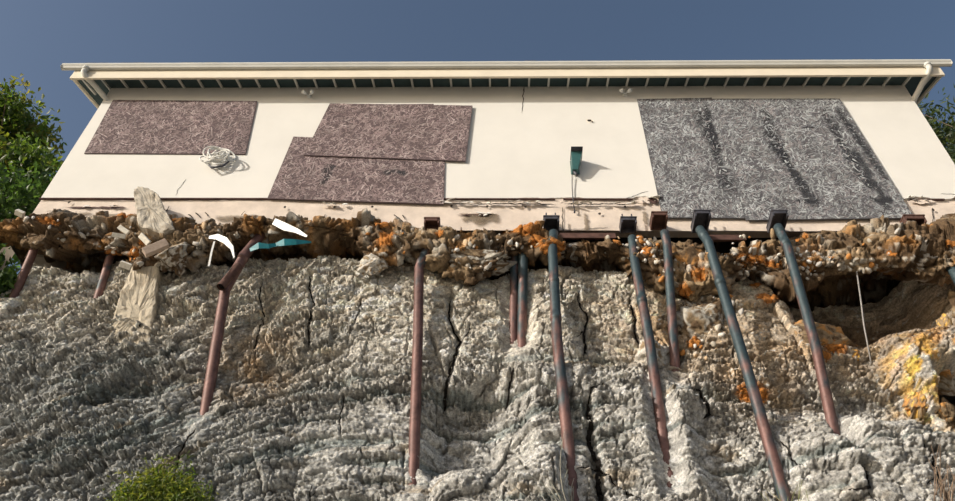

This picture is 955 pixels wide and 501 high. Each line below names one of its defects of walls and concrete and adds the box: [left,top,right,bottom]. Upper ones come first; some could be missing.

flaking render [439,198,541,217]
flaking render [561,195,662,205]
rust [105,240,144,262]
rust [375,220,403,247]
rust [502,222,565,256]
rust [677,267,708,299]
crack [306,276,317,346]
crack [577,293,588,358]
crack [443,301,470,414]
rust [736,382,768,403]
crack [577,382,642,501]
crack [848,466,877,501]